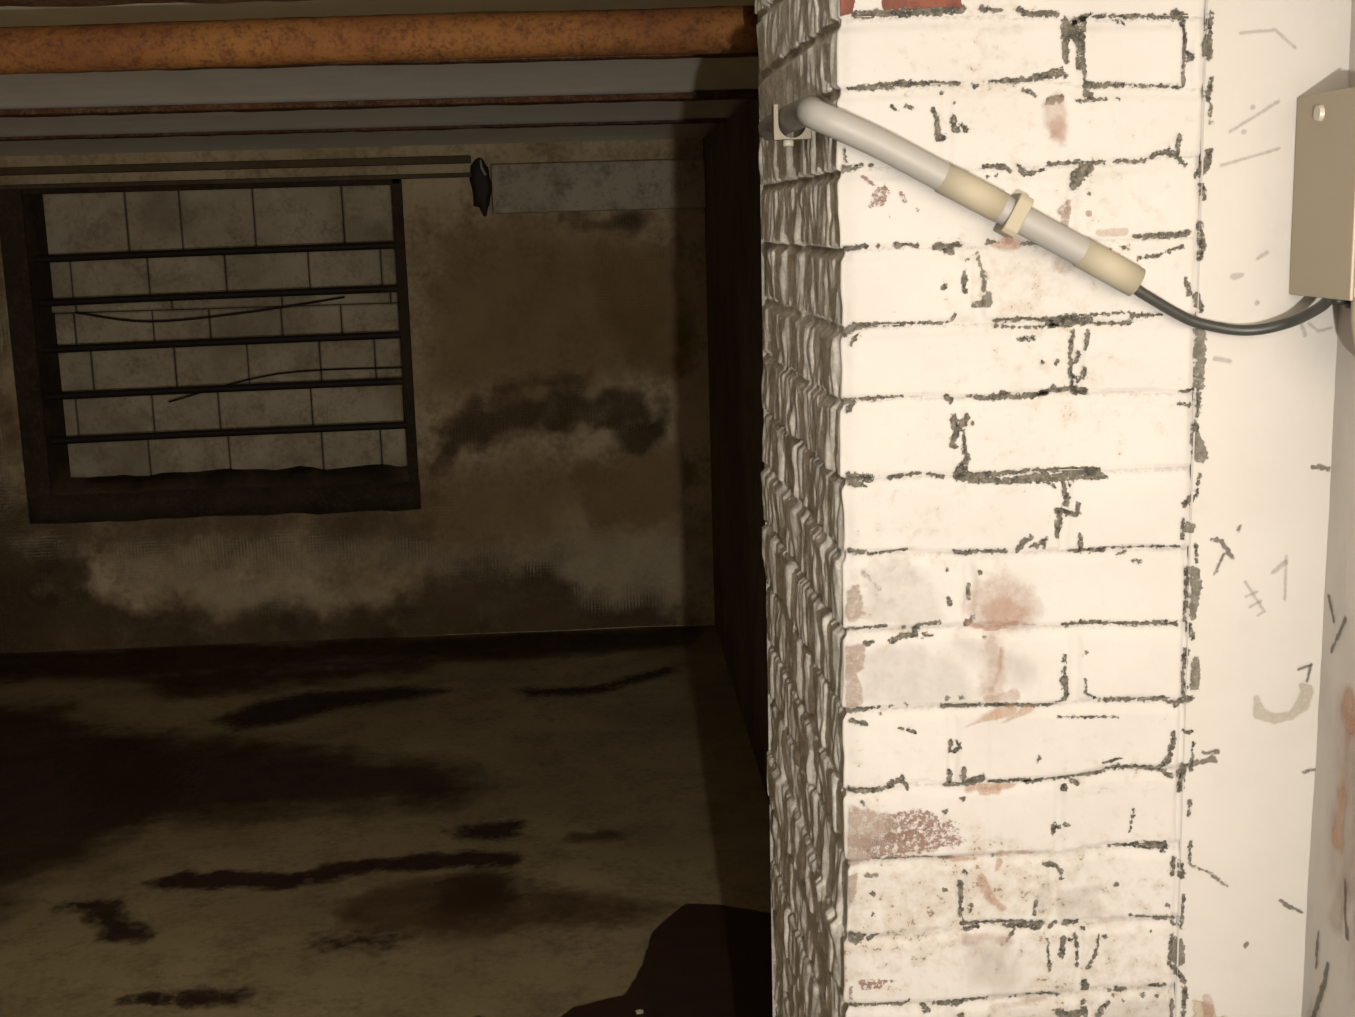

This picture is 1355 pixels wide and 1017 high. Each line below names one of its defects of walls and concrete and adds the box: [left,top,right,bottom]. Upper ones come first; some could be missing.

leakage [435,376,664,465]
leakage [0,545,696,886]
leakage [59,900,154,942]
leakage [118,989,251,1009]
leakage [145,820,645,952]
leakage [561,904,773,1017]
peeling [1193,1001,1216,1017]